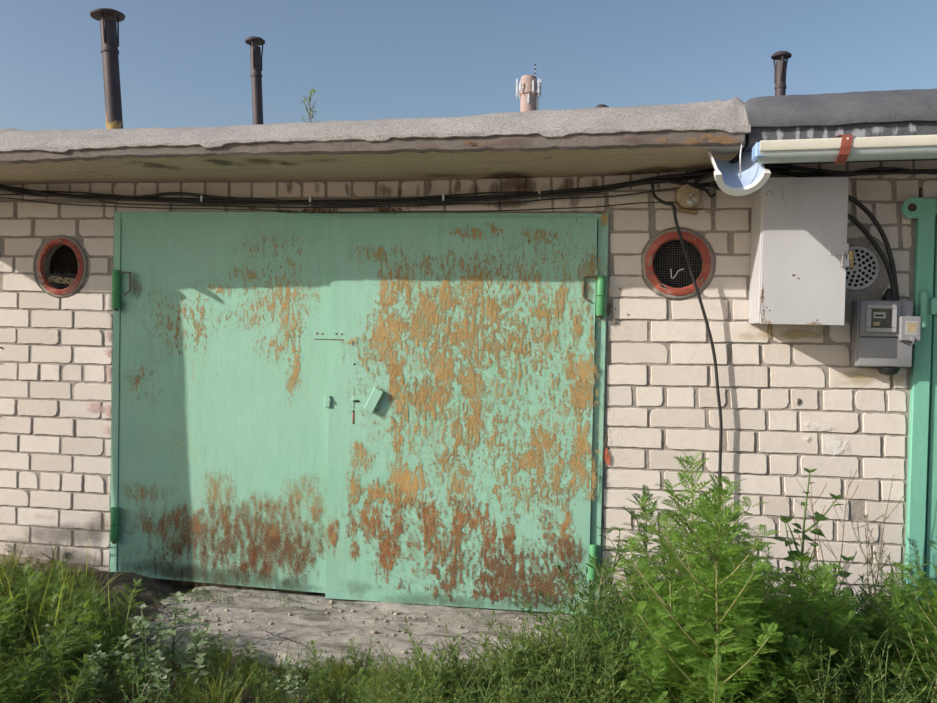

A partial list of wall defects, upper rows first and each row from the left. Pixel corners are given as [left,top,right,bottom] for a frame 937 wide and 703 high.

rust [119,204,618,609]